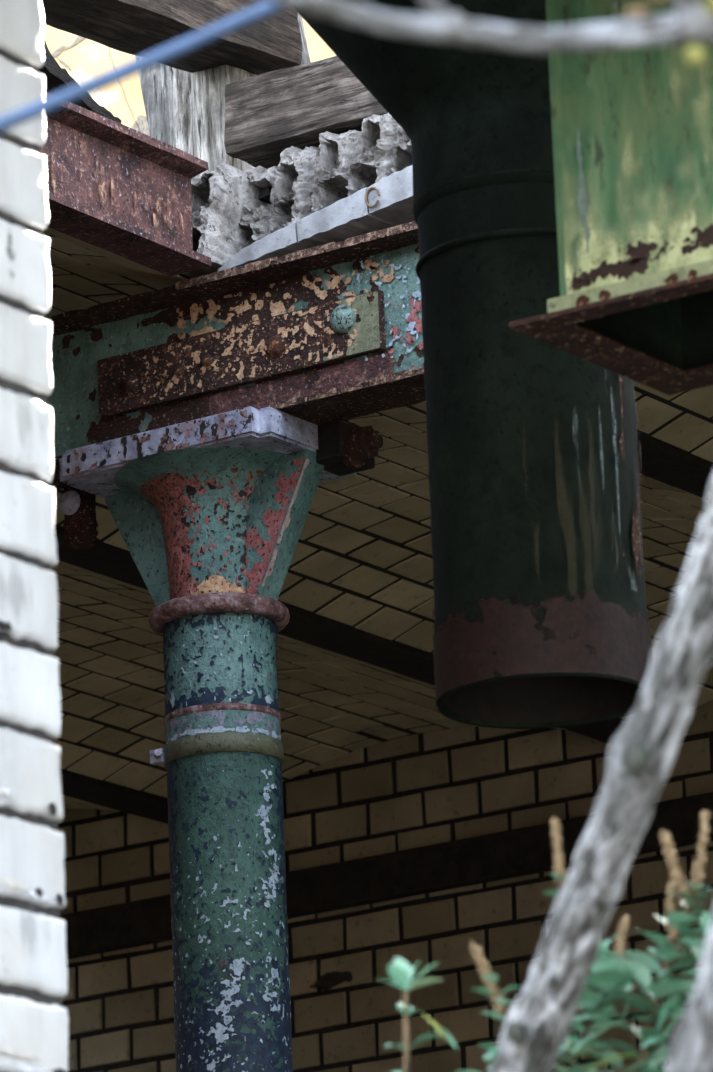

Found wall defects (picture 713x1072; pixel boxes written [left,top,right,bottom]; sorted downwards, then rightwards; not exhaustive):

rust [97,162,119,211]
rust [134,192,183,227]
rust [62,327,112,357]
rust [137,267,347,343]
rust [352,257,379,295]
peeling [118,410,247,462]
rust [66,345,424,474]
peeling [140,457,309,600]
peeling [163,612,281,745]
rust [432,590,652,708]
peeling [167,753,293,1072]